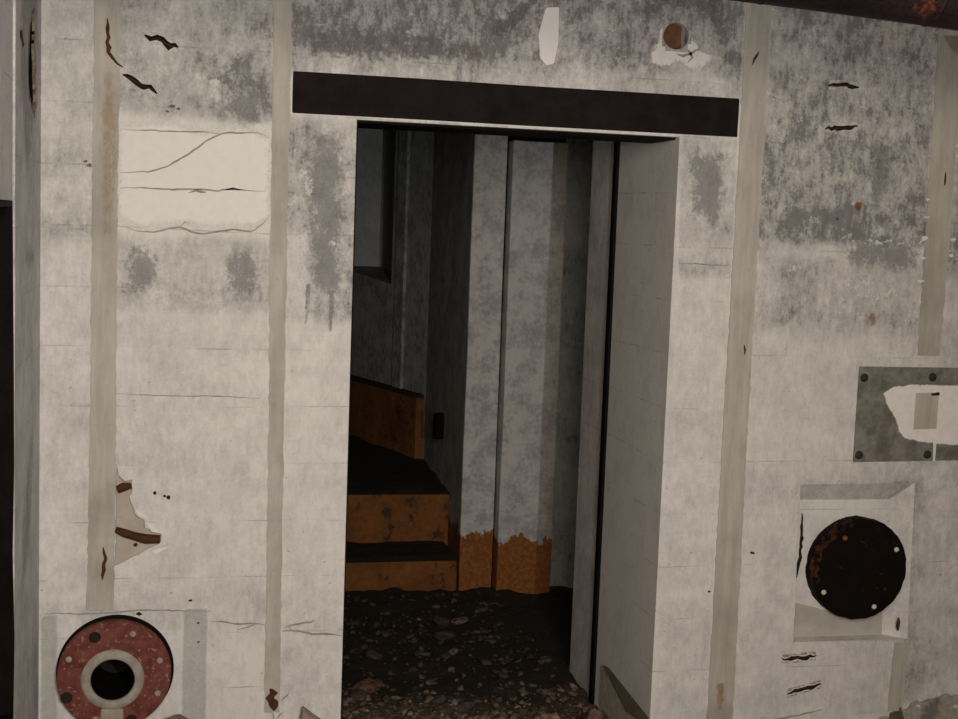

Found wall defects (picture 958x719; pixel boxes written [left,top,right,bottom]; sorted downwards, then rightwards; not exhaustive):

water stain [494,0,537,35]
spalling [28,8,36,118]
water stain [312,31,478,60]
flaking render [650,24,713,70]
crack [121,129,268,193]
crack [128,217,269,235]
water stain [306,139,341,330]
water stain [848,239,913,268]
flaking render [115,469,168,565]
spalling [787,680,821,696]
peeling [901,694,958,719]